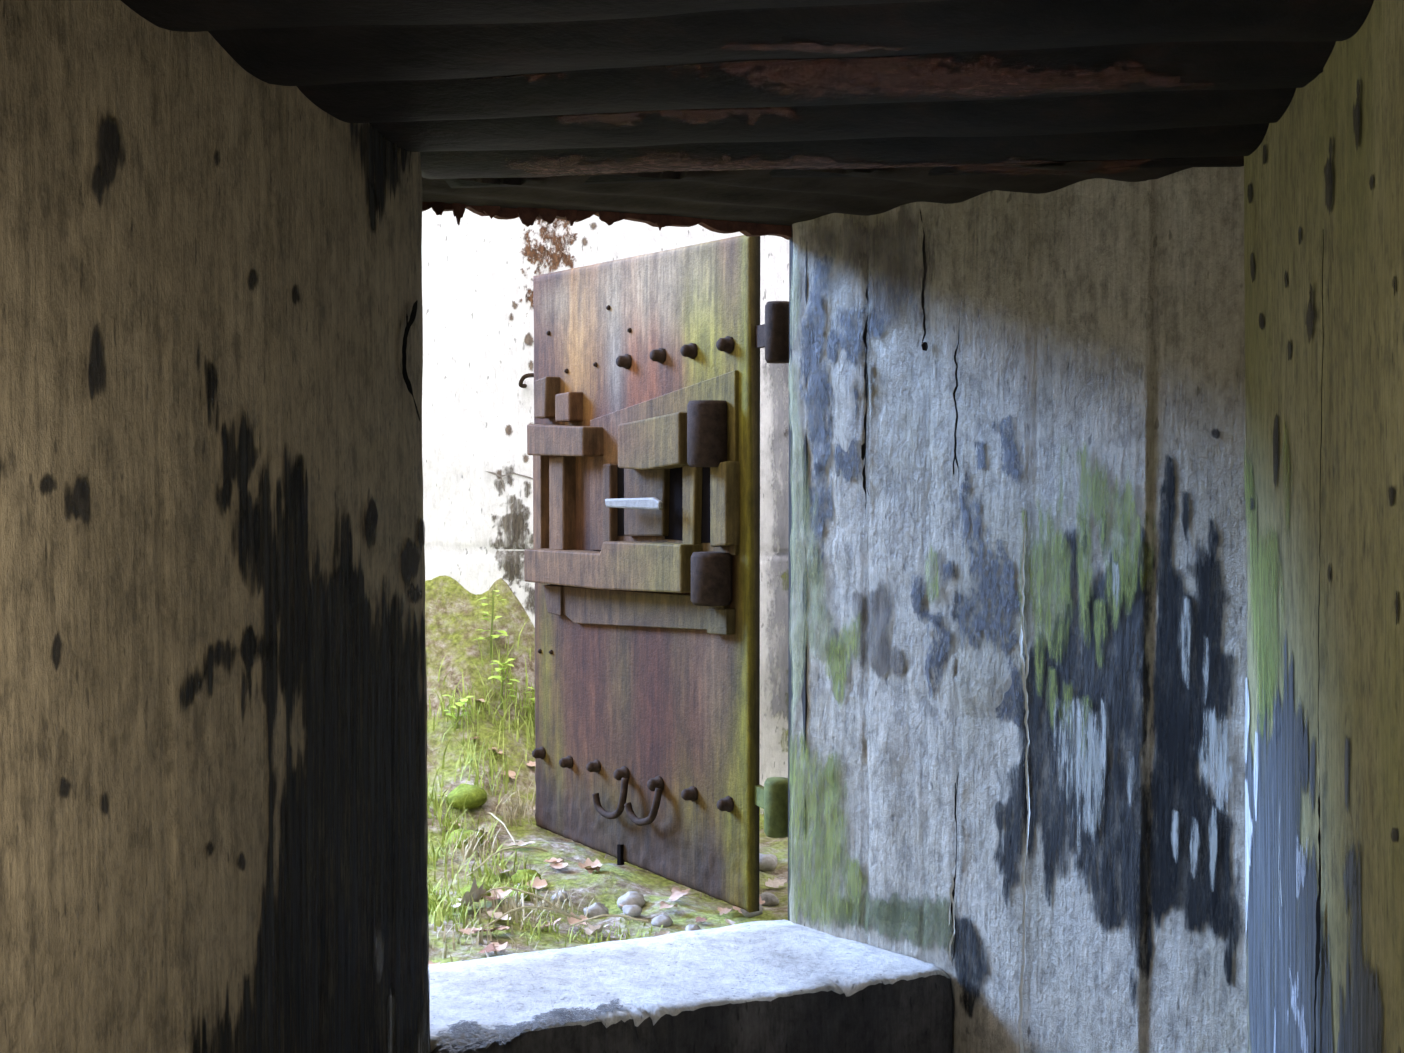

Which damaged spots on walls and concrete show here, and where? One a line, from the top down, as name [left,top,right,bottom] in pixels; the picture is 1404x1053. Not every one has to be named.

leakage [764,253,895,719]
crack [920,210,960,475]
leakage [950,917,987,1018]
leakage [994,456,1401,1053]